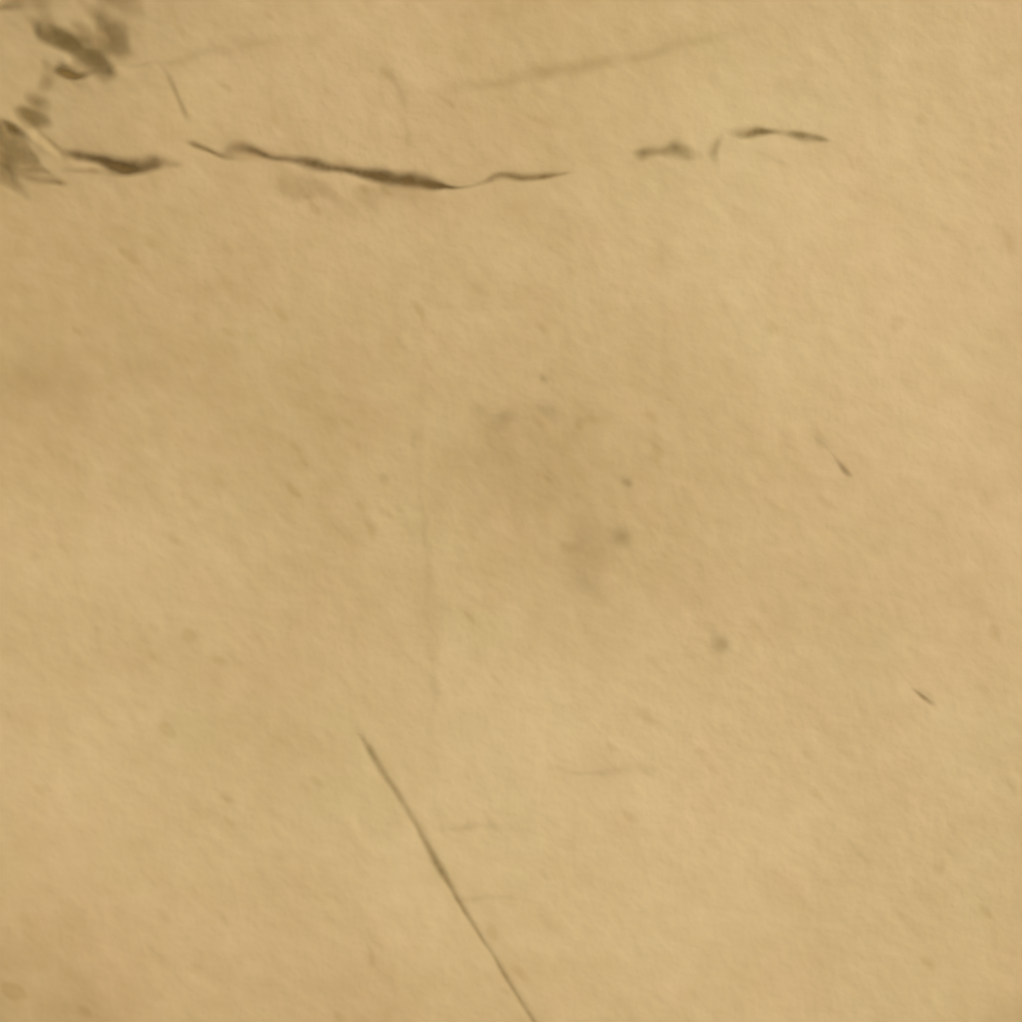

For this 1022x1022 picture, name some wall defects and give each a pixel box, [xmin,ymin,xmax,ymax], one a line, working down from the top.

flaking render [51,30,100,64]
flaking render [58,69,84,79]
crack [753,127,770,135]
crack [75,154,157,174]
crack [302,160,456,189]